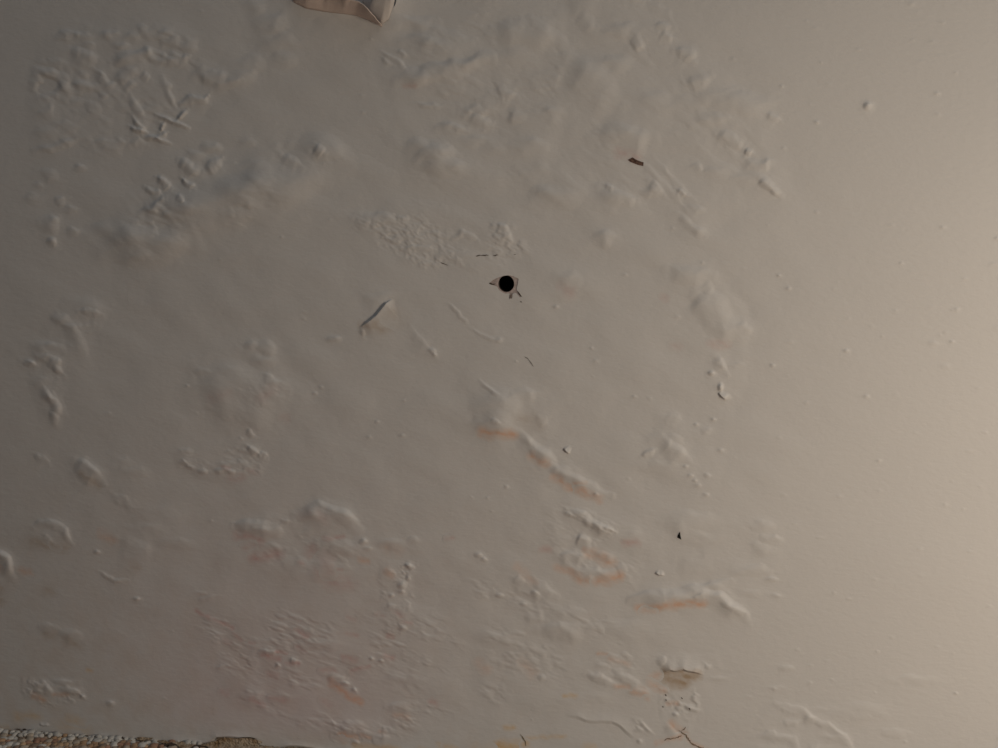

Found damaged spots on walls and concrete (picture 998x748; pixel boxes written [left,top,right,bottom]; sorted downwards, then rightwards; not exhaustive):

peeling [268,0,511,40]
flaking render [136,728,350,748]